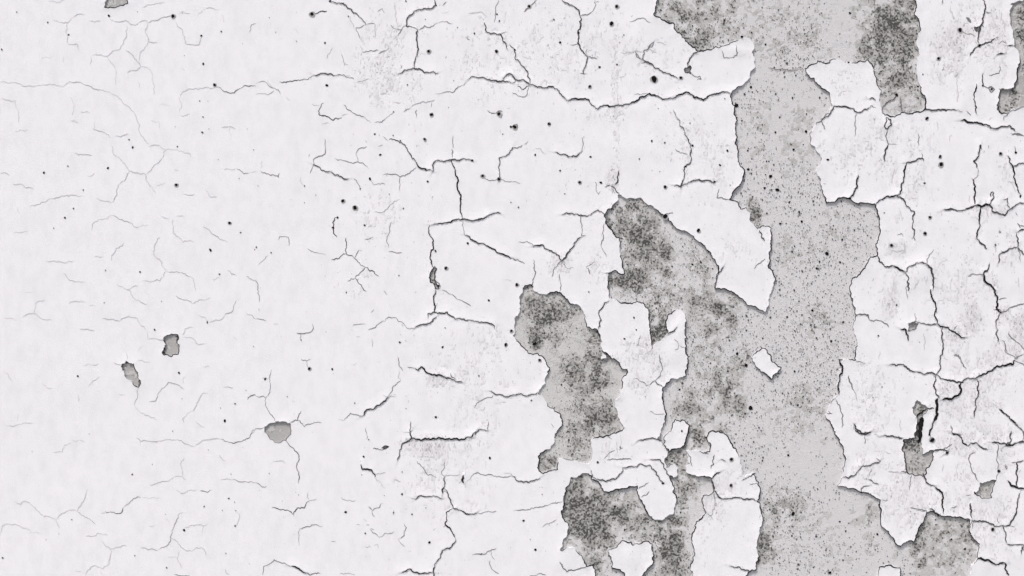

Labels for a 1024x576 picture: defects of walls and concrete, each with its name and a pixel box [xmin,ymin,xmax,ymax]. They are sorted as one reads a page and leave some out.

spalling [104,0,128,8]
spalling [997,0,1024,114]
crack [2,0,729,401]
spalling [513,0,980,576]
crack [821,0,1024,576]
spalling [121,361,141,387]
spalling [162,334,180,357]
spalling [264,421,291,443]
crack [0,358,560,576]
crack [592,411,756,518]